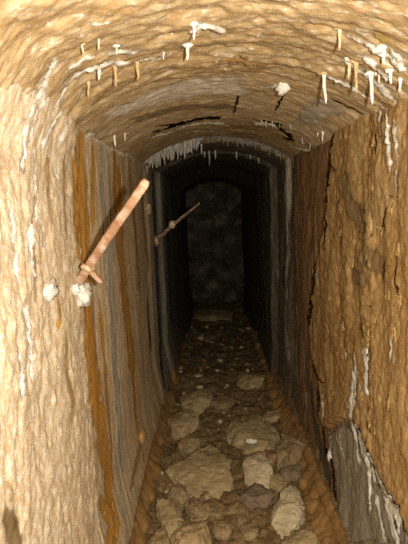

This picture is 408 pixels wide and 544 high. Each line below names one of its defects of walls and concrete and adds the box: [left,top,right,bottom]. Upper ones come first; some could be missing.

rust [45,156,53,230]
leakage [41,50,172,151]
crack [152,116,221,135]
crack [253,94,295,142]
crack [323,134,335,251]
leakage [342,33,406,103]
efflorescence [378,107,398,201]
rust [56,300,74,421]
rust [62,130,150,544]
crack [309,351,337,501]
peeling [308,98,408,544]
efflorescence [348,347,369,429]